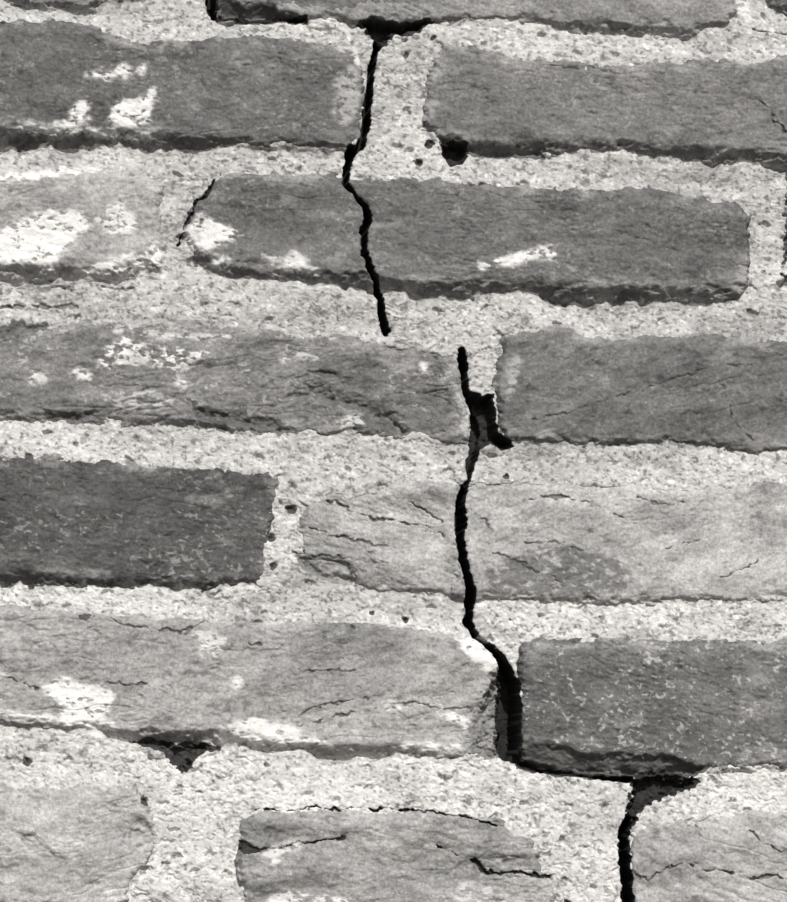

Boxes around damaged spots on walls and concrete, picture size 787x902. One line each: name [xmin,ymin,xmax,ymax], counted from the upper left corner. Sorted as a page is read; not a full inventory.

crack [205,0,308,25]
crack [550,64,611,72]
crack [176,166,221,247]
crack [342,15,435,337]
crack [255,346,787,902]
crack [238,835,346,854]